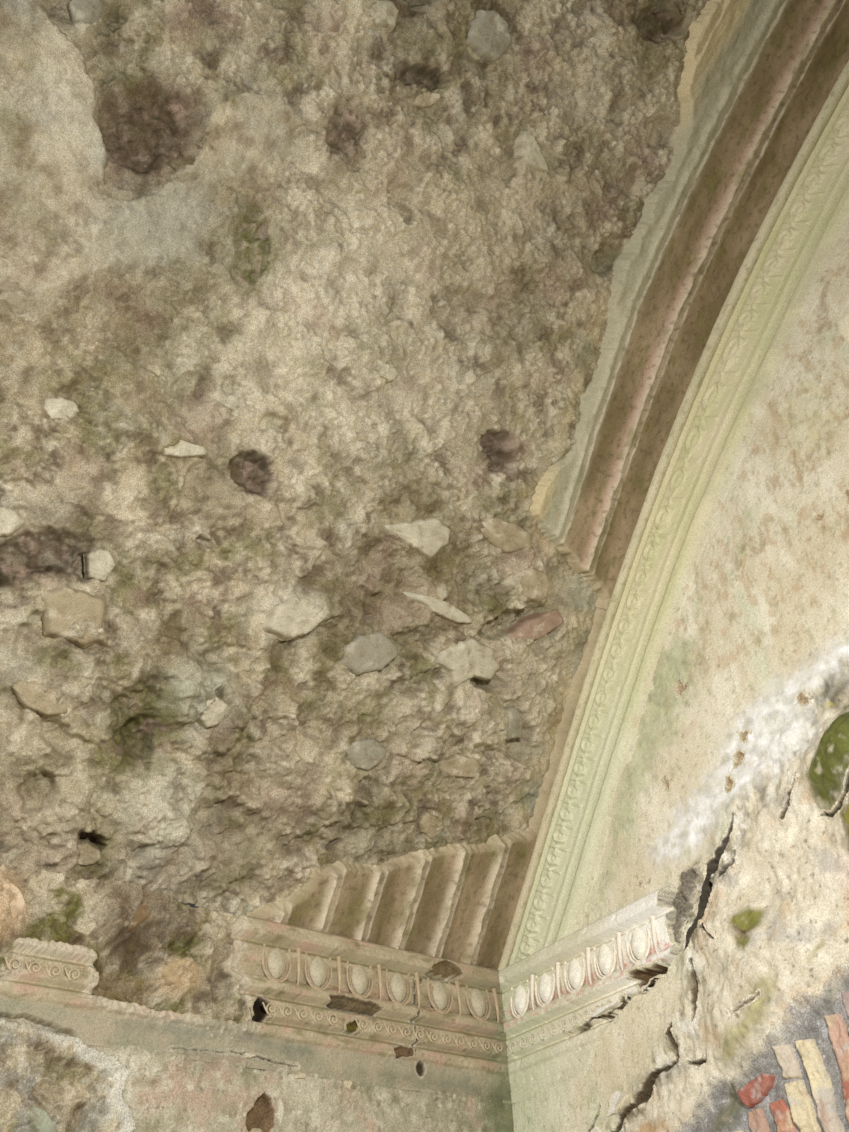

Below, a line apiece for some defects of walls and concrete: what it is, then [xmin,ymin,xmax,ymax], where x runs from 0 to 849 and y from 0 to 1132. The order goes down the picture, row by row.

spalling [97,69,209,190]
spalling [317,88,375,173]
spalling [0,525,107,598]
spalling [101,676,193,781]
damp [651,643,849,863]
spalling [0,864,252,1024]
crack [567,992,630,1040]
crack [585,810,738,1132]
spalling [633,858,707,955]
crack [726,988,761,1019]
spalling [0,1017,136,1132]
spalling [242,1088,284,1132]